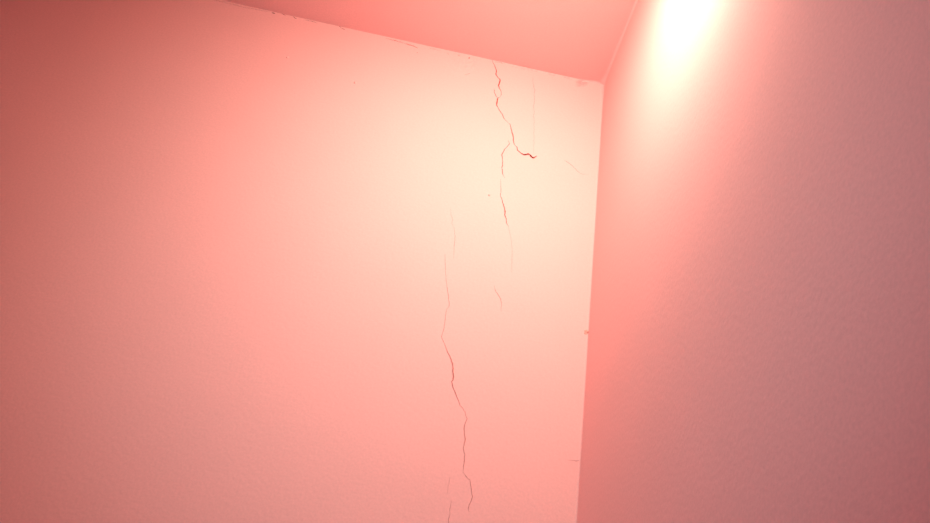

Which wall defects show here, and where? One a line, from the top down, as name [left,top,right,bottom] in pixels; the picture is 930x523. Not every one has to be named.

crack [492,61,537,266]
crack [441,215,473,523]